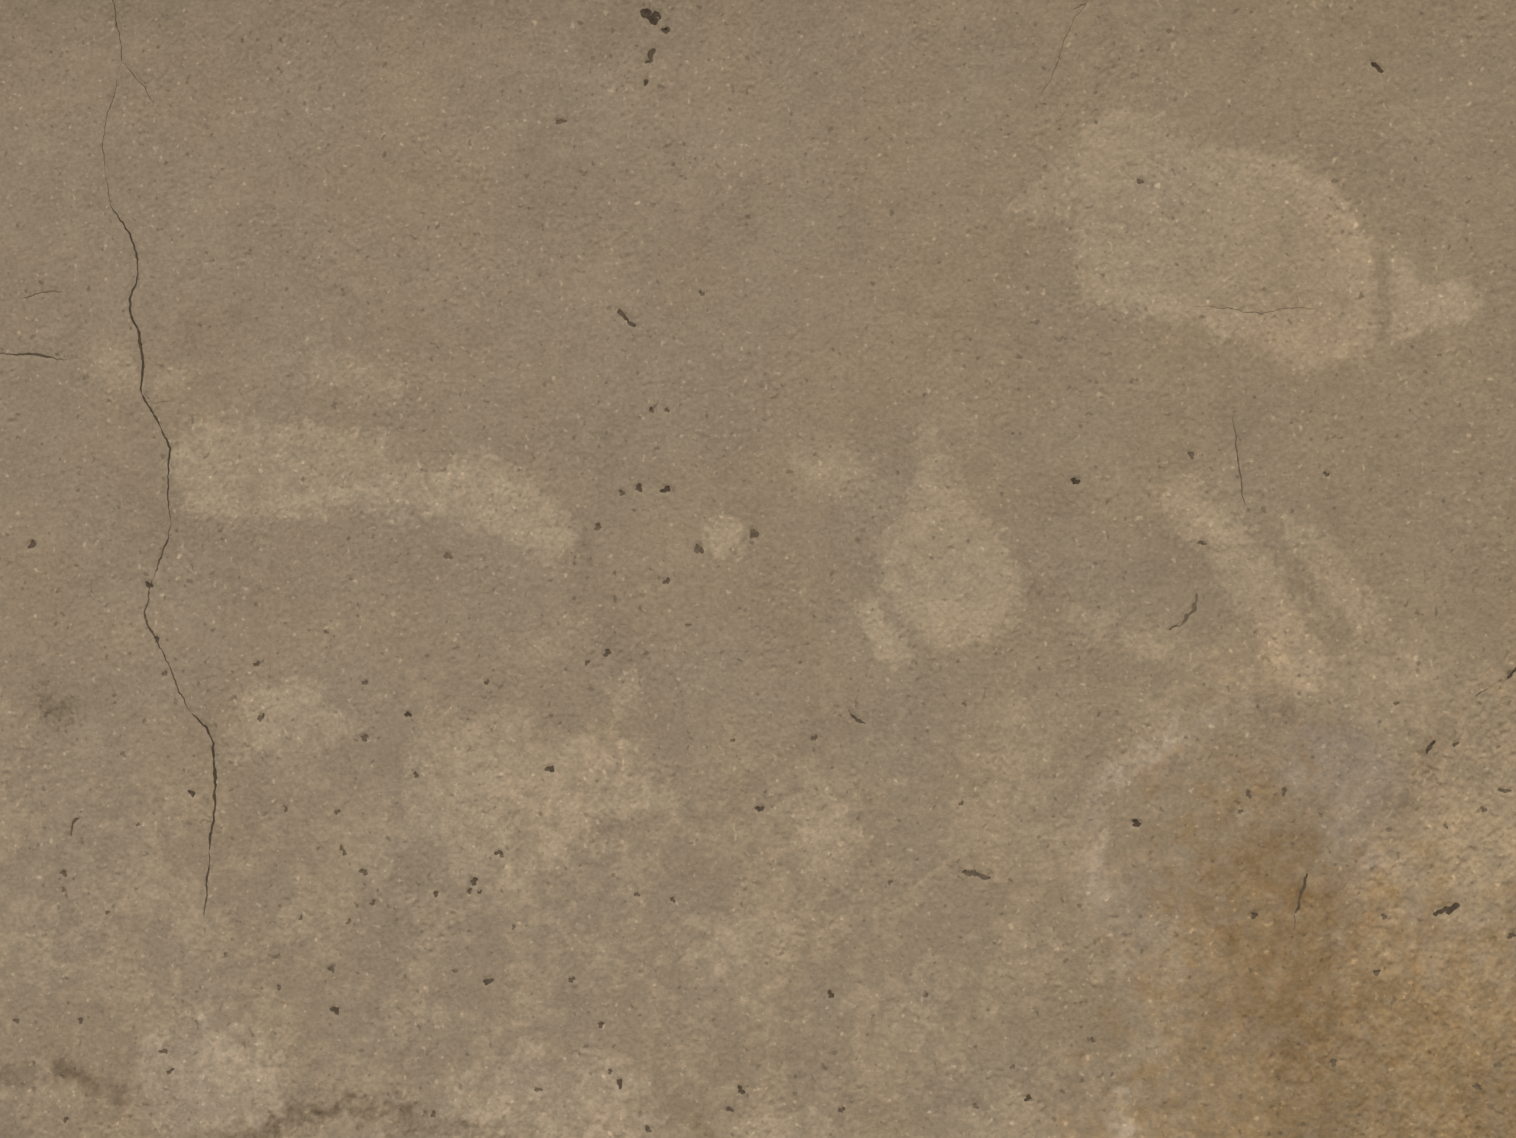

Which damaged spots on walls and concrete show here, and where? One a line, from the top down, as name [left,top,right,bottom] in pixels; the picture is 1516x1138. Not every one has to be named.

crack [102,0,217,917]
peeling [1131,451,1516,763]
peeling [1433,902,1460,916]